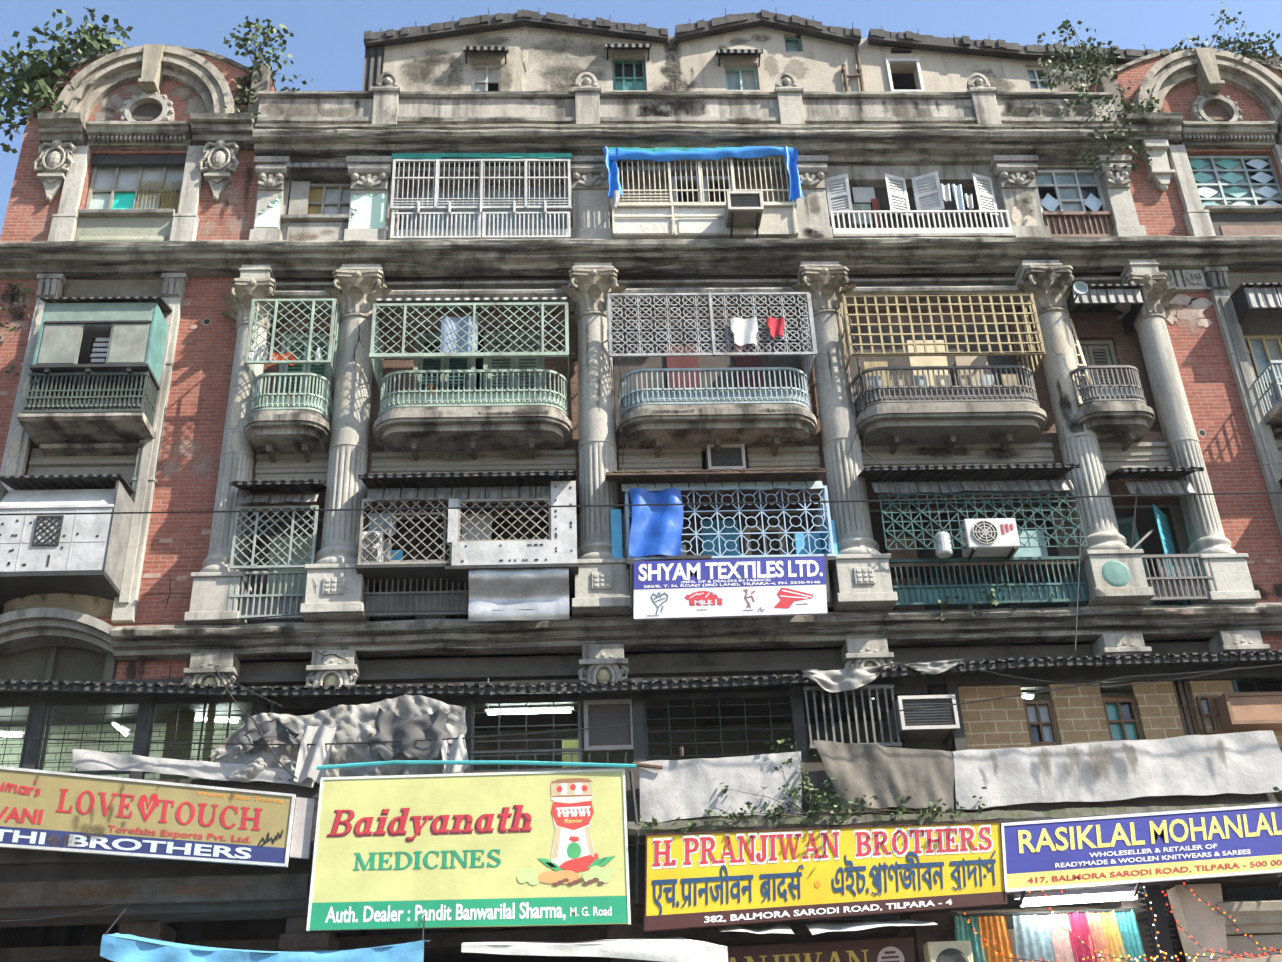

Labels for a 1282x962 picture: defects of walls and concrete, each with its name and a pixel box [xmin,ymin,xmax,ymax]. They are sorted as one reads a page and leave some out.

damp [405,49,462,90]
damp [535,38,603,92]
damp [638,39,707,124]
peeling [254,194,281,227]
peeling [348,193,387,229]
damp [0,283,27,341]
peeling [1165,294,1213,331]
damp [1039,744,1138,778]